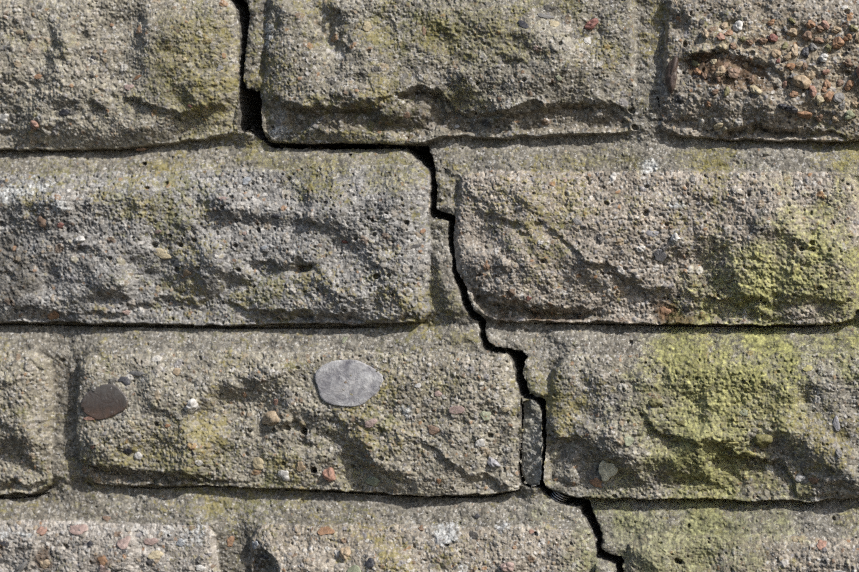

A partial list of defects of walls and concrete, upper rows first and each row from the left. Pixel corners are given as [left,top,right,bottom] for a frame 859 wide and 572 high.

crack [229,0,624,572]
crack [0,322,382,330]
crack [534,321,831,329]
crack [119,483,246,491]
crack [0,492,50,500]